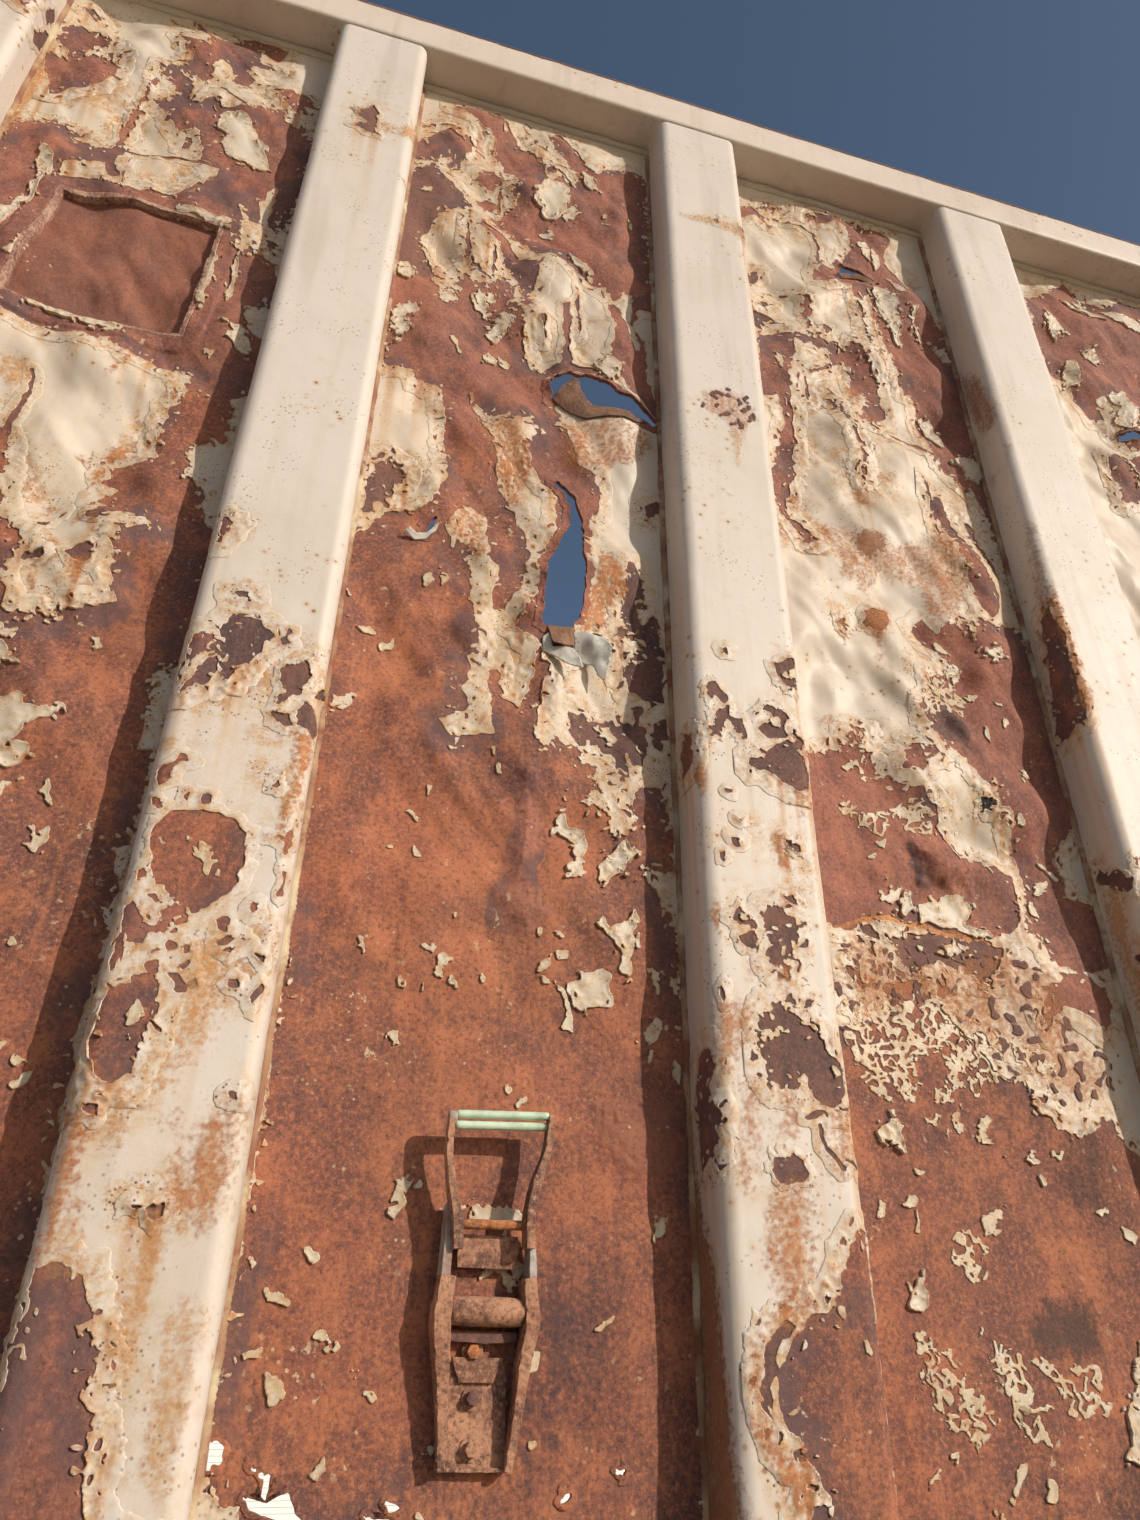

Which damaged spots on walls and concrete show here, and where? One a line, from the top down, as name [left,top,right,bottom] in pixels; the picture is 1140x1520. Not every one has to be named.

spalling [2,0,139,105]
rust [0,356,35,436]
rust [540,286,656,416]
rust [581,555,626,631]
rust [825,529,970,615]
rust [279,730,312,829]
peeling [0,17,740,1520]
rust [150,810,246,911]
peeling [675,196,1140,1520]
rust [166,1118,234,1227]
rust [767,1185,817,1332]
rust [693,1156,748,1520]